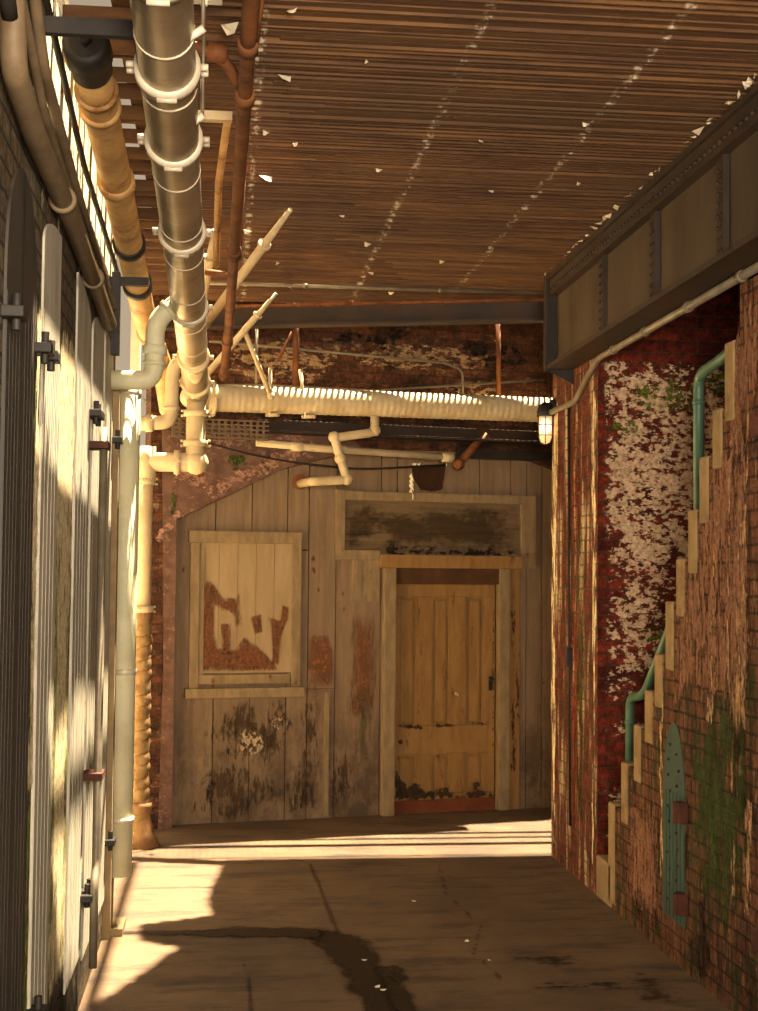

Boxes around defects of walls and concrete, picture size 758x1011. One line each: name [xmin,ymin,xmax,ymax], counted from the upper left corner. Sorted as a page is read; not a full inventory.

peeling [591,300,758,917]
leakage [193,703,354,819]
leakage [50,953,85,1011]
leakage [123,926,416,1011]